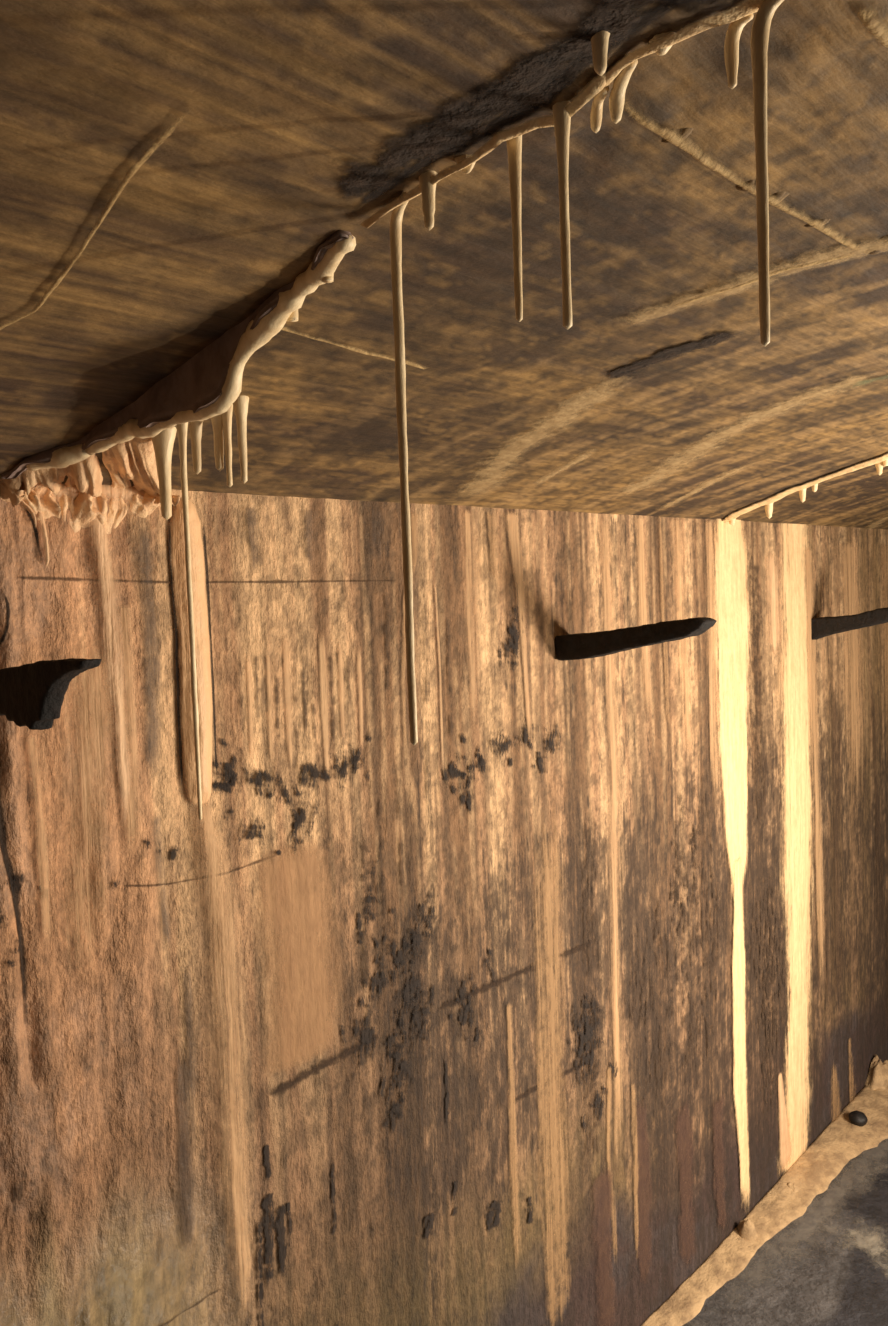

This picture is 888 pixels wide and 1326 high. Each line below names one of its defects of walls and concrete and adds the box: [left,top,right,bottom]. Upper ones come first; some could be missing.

spalling [338,0,727,199]
leakage [628,241,888,324]
leakage [169,529,183,785]
crack [0,0,784,821]
leakage [425,512,561,812]
leakage [461,332,735,494]
leakage [637,467,744,626]
leakage [626,377,865,493]
crack [723,454,888,526]
crack [0,792,27,1015]
leakage [203,529,372,1326]
leakage [485,519,888,1322]